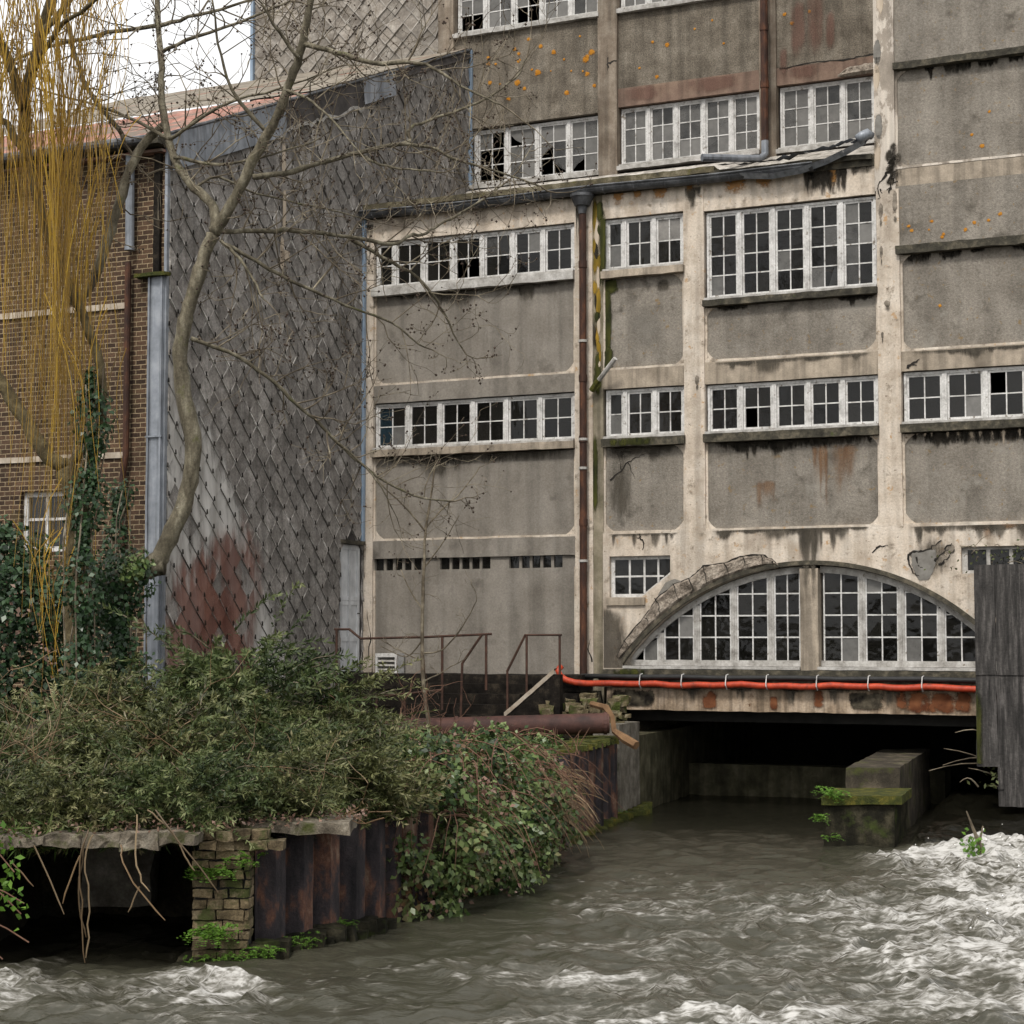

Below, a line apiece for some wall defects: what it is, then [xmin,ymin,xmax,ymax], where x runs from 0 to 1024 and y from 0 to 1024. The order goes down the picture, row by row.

leakage [614,188,667,201]
leakage [726,179,771,192]
leakage [803,166,872,193]
leakage [592,200,618,394]
crack [610,452,647,481]
spalling [907,540,955,580]
spalling [611,689,654,706]
spalling [849,692,883,710]